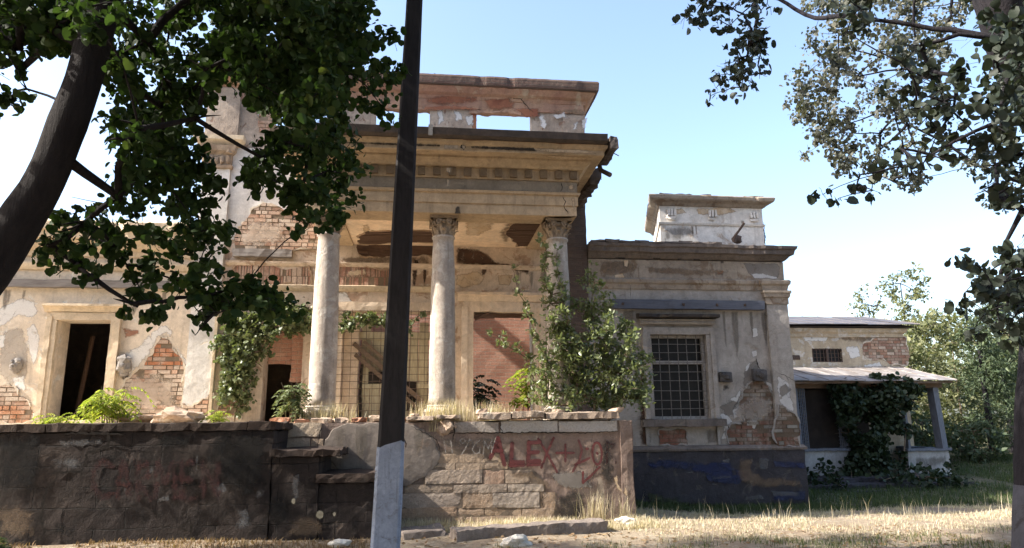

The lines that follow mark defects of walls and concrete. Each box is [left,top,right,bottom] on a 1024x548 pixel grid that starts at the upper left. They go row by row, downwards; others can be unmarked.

peeling [437,110,473,125]
flaking render [232,202,318,285]
flaking render [0,298,39,425]
flaking render [114,326,242,420]
flaking render [717,350,801,447]
flaking render [846,336,910,367]